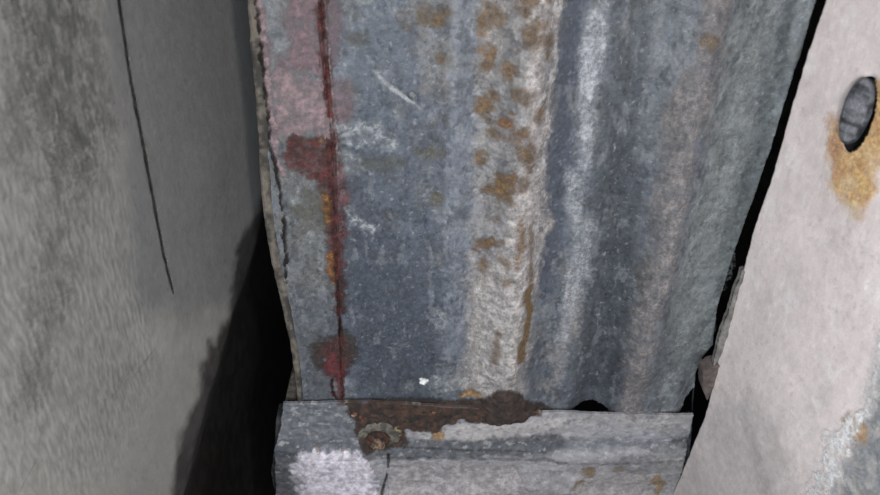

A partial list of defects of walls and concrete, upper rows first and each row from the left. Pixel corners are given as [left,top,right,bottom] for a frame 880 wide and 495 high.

leakage [36,0,105,149]
rust [517,0,553,59]
crack [117,0,174,294]
rust [248,0,303,402]
rust [283,2,348,315]
rust [476,238,504,248]
rust [475,91,535,202]
rust [829,86,880,218]
rust [517,272,533,364]
rust [309,330,487,456]
crack [381,447,519,495]